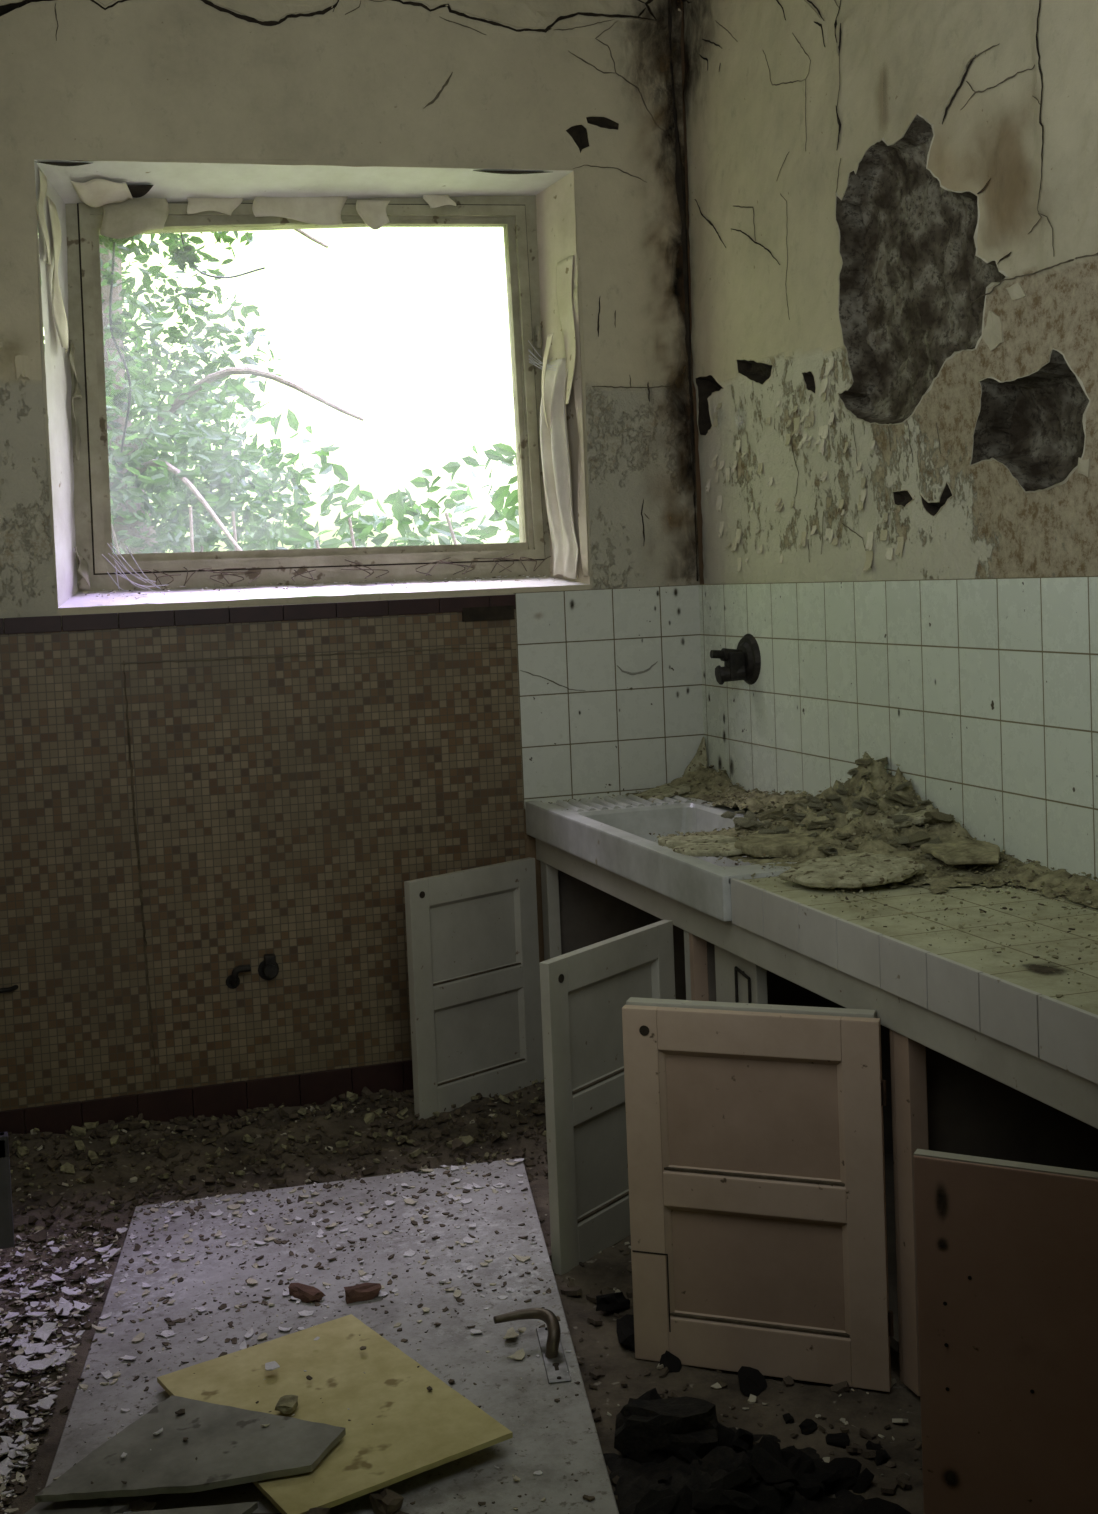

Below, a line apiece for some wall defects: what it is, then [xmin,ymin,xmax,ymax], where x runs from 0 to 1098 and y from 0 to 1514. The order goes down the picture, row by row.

crack [55,0,128,41]
peeling [187,196,390,230]
crack [201,0,841,320]
peeling [565,115,619,154]
crack [940,0,1098,306]
peeling [38,162,169,460]
damp [642,0,706,581]
flaking render [695,374,724,436]
flaking render [736,359,773,385]
flaking render [765,113,1026,548]
flaking render [970,348,1091,493]
peeling [863,481,953,572]